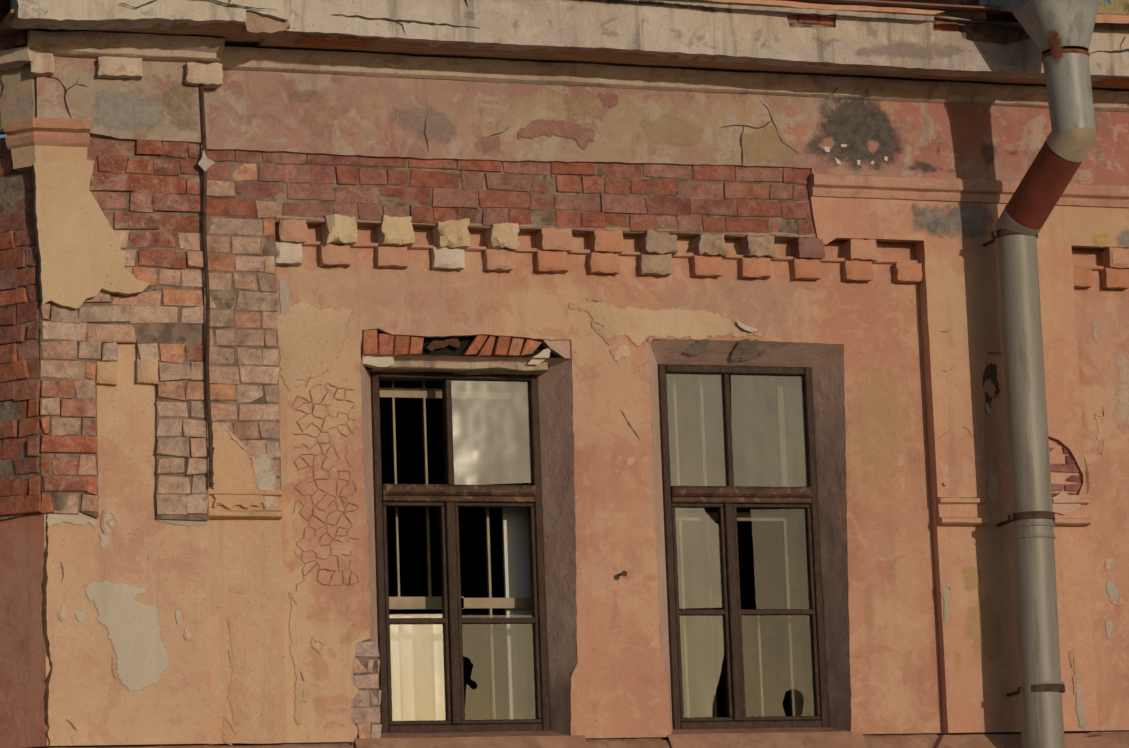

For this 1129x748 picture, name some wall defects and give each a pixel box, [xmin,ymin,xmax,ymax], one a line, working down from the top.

crack [1092,37,1129,53]
crack [51,77,88,119]
crack [725,109,801,167]
flaking render [0,118,816,548]
spalling [982,363,1001,415]
spalling [1049,438,1090,515]
peeling [58,580,169,693]